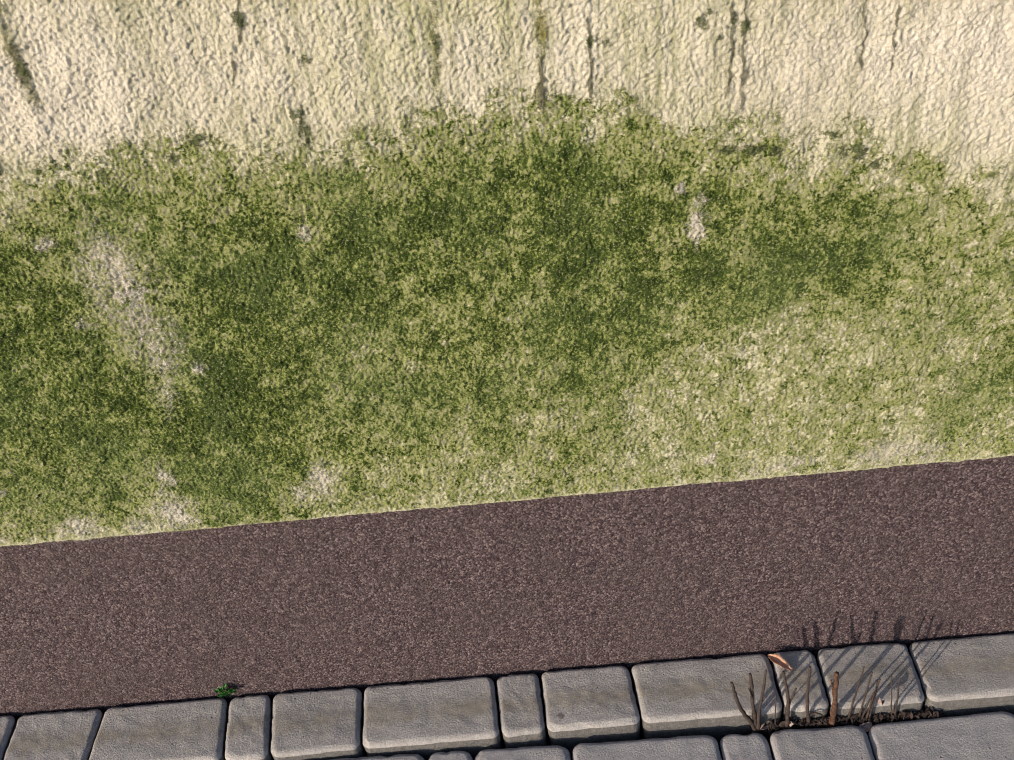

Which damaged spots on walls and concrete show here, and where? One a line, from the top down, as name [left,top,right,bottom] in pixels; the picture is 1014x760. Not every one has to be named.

damp [10,45,28,83]
damp [537,56,545,110]
damp [727,0,750,110]